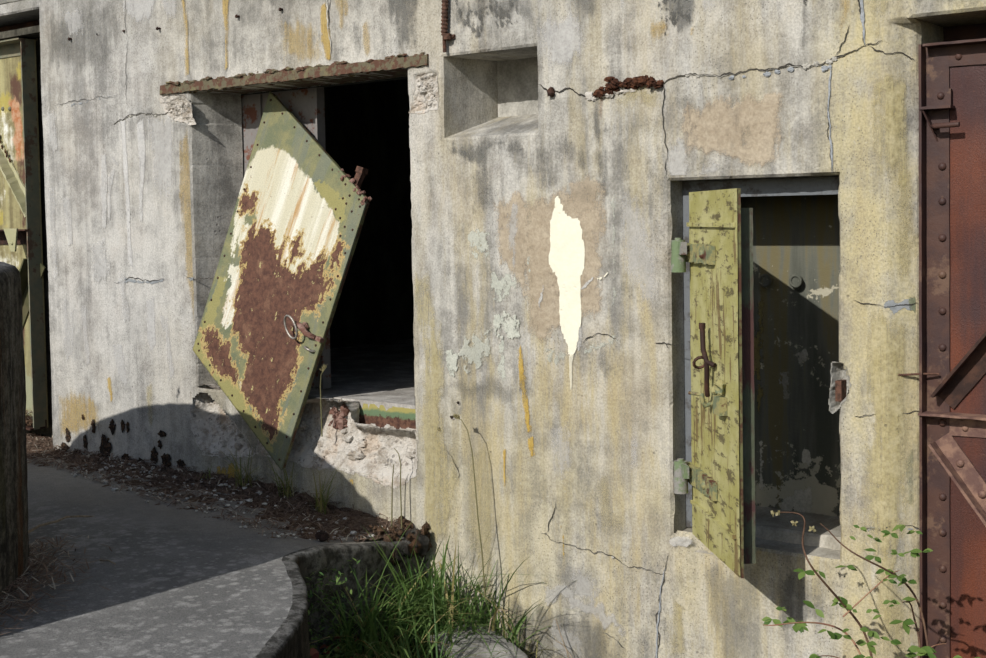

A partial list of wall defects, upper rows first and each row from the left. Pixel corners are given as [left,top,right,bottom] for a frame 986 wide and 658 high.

crack [55,1,172,124]
spalling [409,69,439,114]
crack [539,84,586,98]
rust [584,75,664,101]
water stain [658,0,691,35]
crack [662,0,913,178]
flaking render [445,177,617,389]
spalling [190,384,271,458]
spalling [288,398,419,489]
spalling [828,362,852,414]
spalling [61,414,432,566]
crack [542,504,669,658]